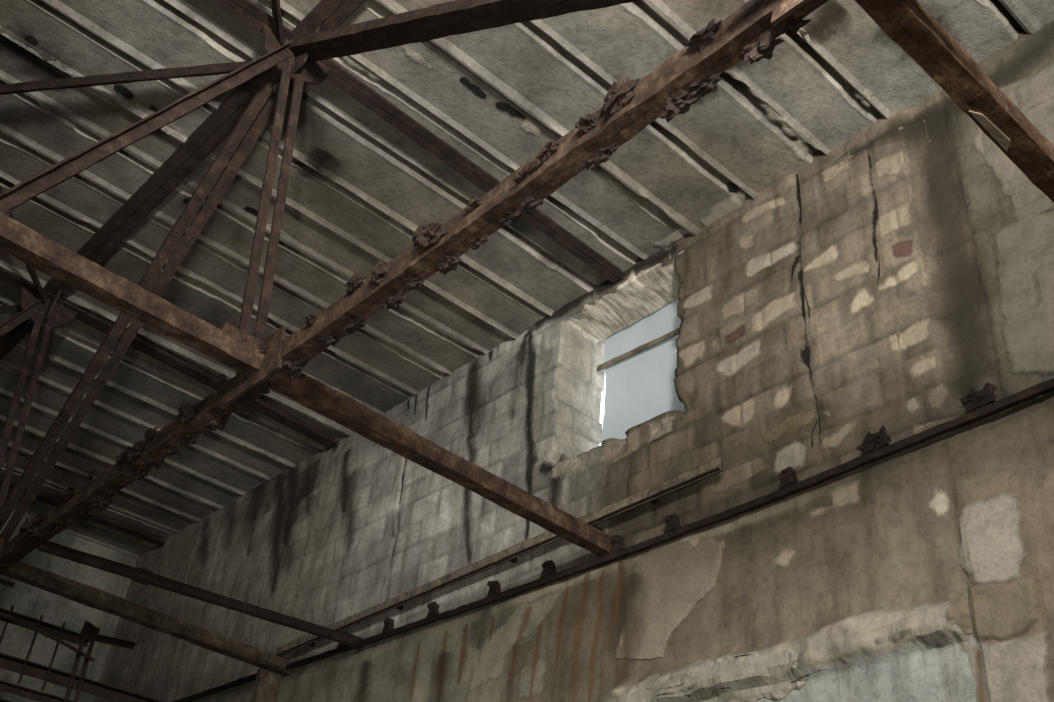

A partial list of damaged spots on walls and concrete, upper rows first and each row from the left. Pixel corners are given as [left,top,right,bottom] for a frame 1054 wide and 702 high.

crack [868,154,880,284]
crack [792,174,820,448]
damp [466,350,493,462]
damp [514,244,678,507]
damp [250,460,318,593]
damp [333,439,354,547]
damp [463,488,472,562]
peeling [615,536,724,660]
spalling [605,646,806,702]